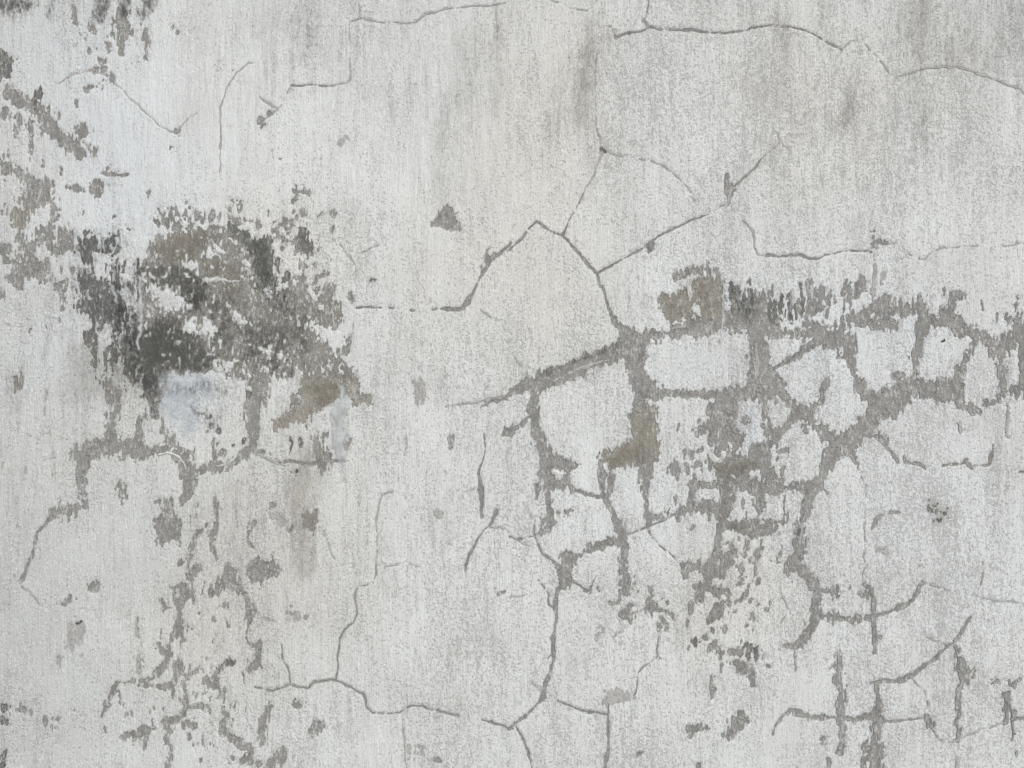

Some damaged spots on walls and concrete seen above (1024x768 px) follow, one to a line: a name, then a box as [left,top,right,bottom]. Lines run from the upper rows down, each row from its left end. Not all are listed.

crack [257,0,506,129]
crack [1,389,81,605]
peeling [0,48,374,768]
crack [254,491,636,768]
crack [457,433,529,572]
crack [330,0,1024,418]
damp [711,263,889,345]
crack [818,456,1024,743]
crack [873,403,1011,470]